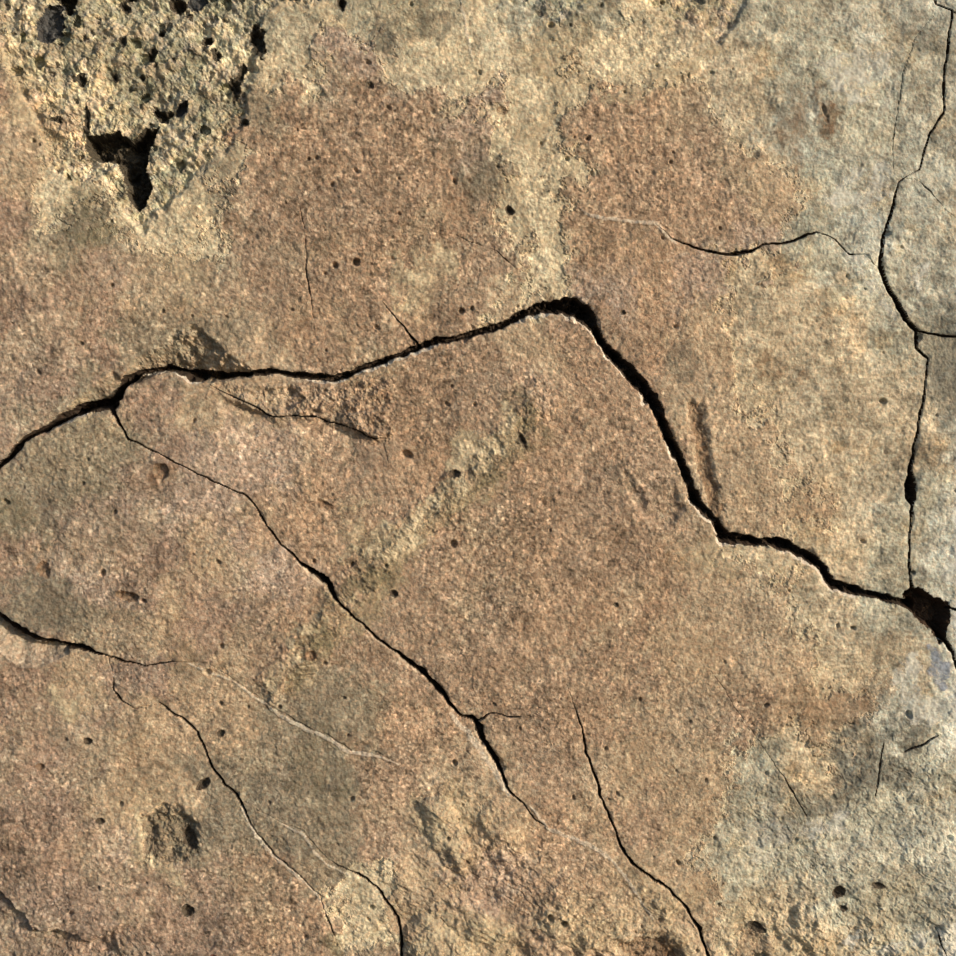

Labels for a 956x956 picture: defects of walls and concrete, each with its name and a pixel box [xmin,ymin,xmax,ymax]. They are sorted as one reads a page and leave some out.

spalling [510,0,599,27]
spalling [643,0,747,45]
spalling [0,0,304,233]
crack [581,209,854,257]
crack [878,0,956,586]
crack [0,296,903,956]
crack [933,631,956,669]
crack [875,735,939,796]